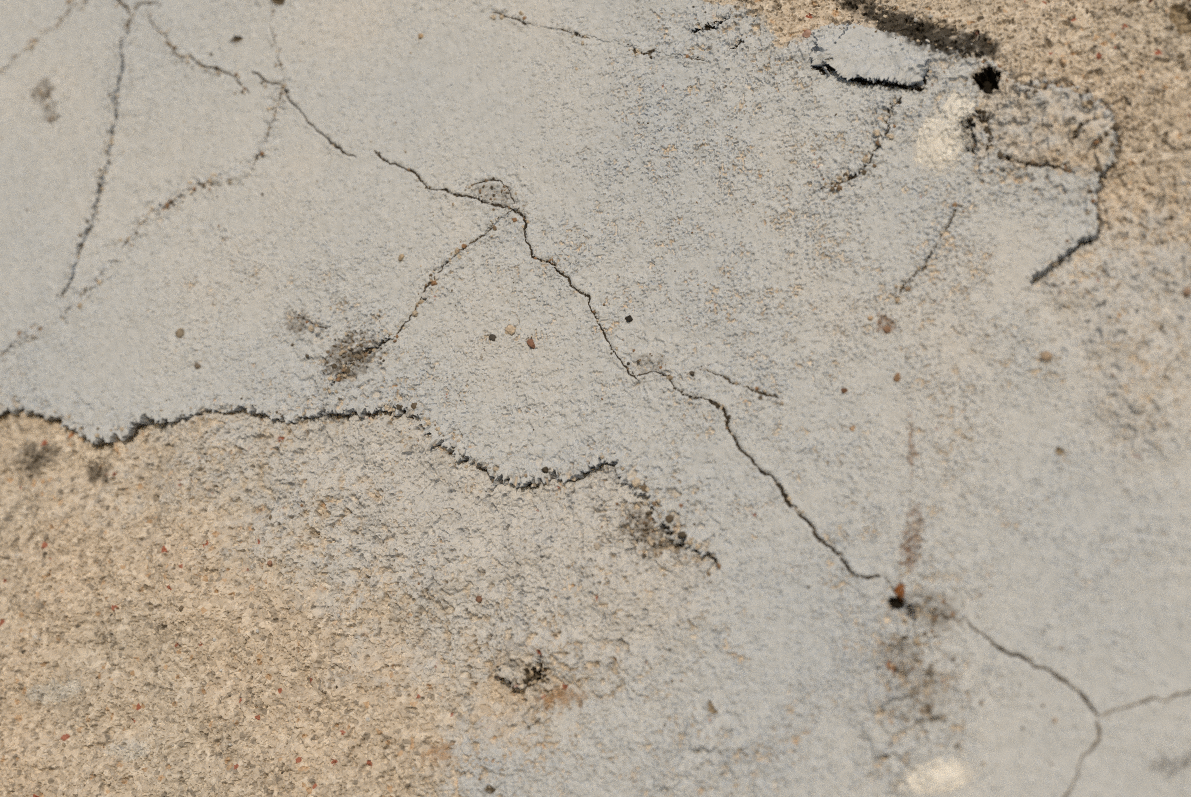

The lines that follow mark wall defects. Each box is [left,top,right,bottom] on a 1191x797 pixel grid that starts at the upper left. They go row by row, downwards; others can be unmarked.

crack [0,0,90,74]
crack [811,65,932,192]
crack [974,104,1110,176]
crack [1024,77,1063,100]
crack [0,326,45,357]
crack [56,0,894,593]
crack [894,199,965,303]
flaking render [703,0,1191,469]
flaking render [0,399,721,797]
spalling [887,596,905,611]
crack [490,655,547,688]
crack [904,608,1191,797]